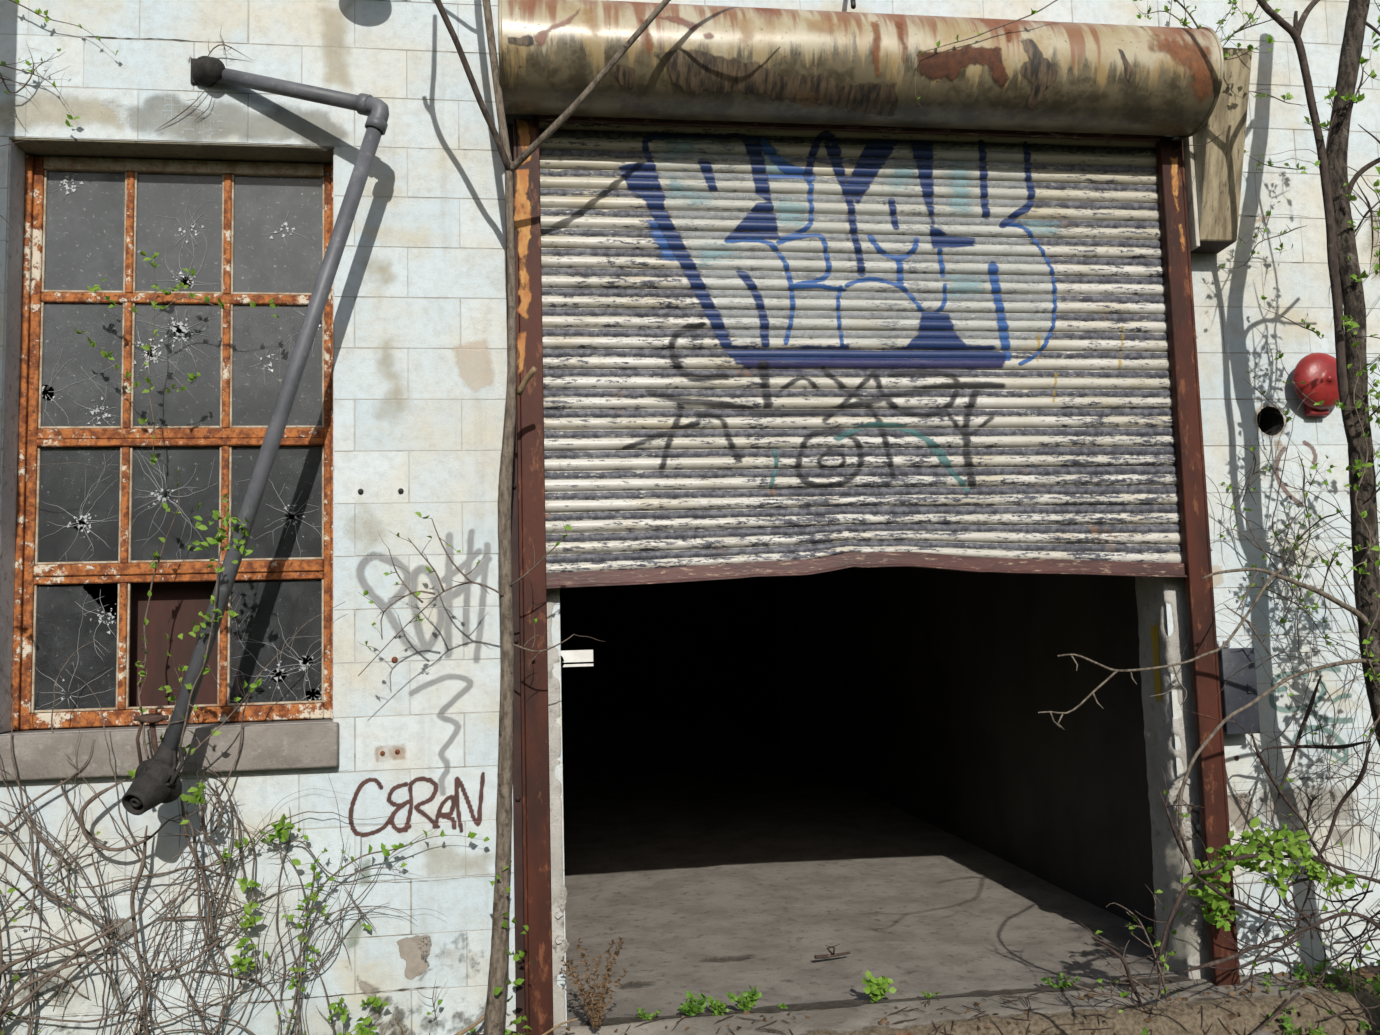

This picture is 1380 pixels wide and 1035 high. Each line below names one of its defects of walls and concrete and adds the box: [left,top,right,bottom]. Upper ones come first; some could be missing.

rust [641,20,653,52]
rust [872,22,881,75]
rust [1150,38,1211,100]
peeling [397,935,444,980]